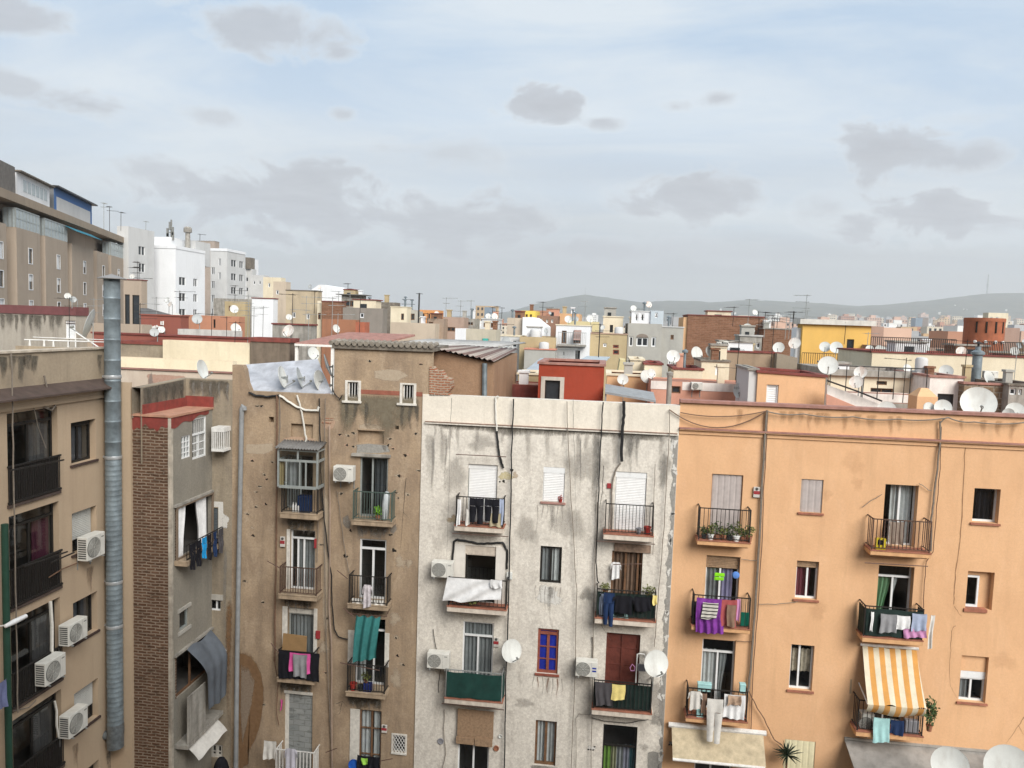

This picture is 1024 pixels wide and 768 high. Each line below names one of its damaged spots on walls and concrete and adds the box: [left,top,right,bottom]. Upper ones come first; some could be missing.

damp [0,314,62,329]
damp [340,396,418,434]
damp [660,461,670,482]
peeling [662,435,678,656]
peeling [648,672,672,768]